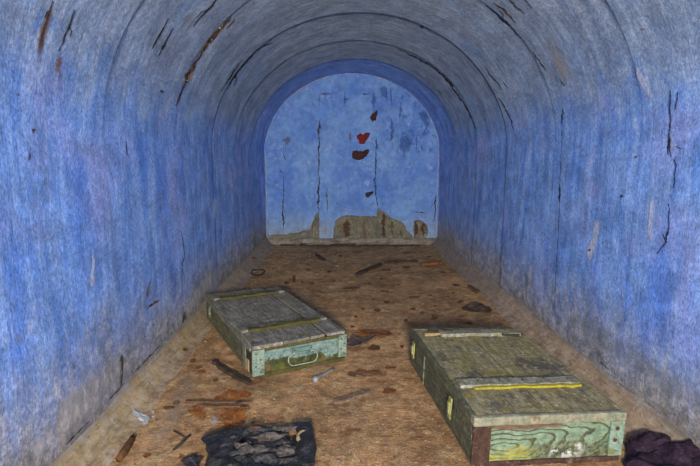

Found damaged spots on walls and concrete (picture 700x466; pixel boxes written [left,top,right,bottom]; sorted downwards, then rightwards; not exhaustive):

corrosion [38,13,51,56]
crack [58,10,75,51]
crack [487,0,532,36]
crack [176,17,236,105]
crack [317,121,328,214]
peeling [352,133,370,160]
crack [371,140,379,206]
crack [667,90,682,188]
flaking render [333,208,428,238]
crack [657,204,670,254]